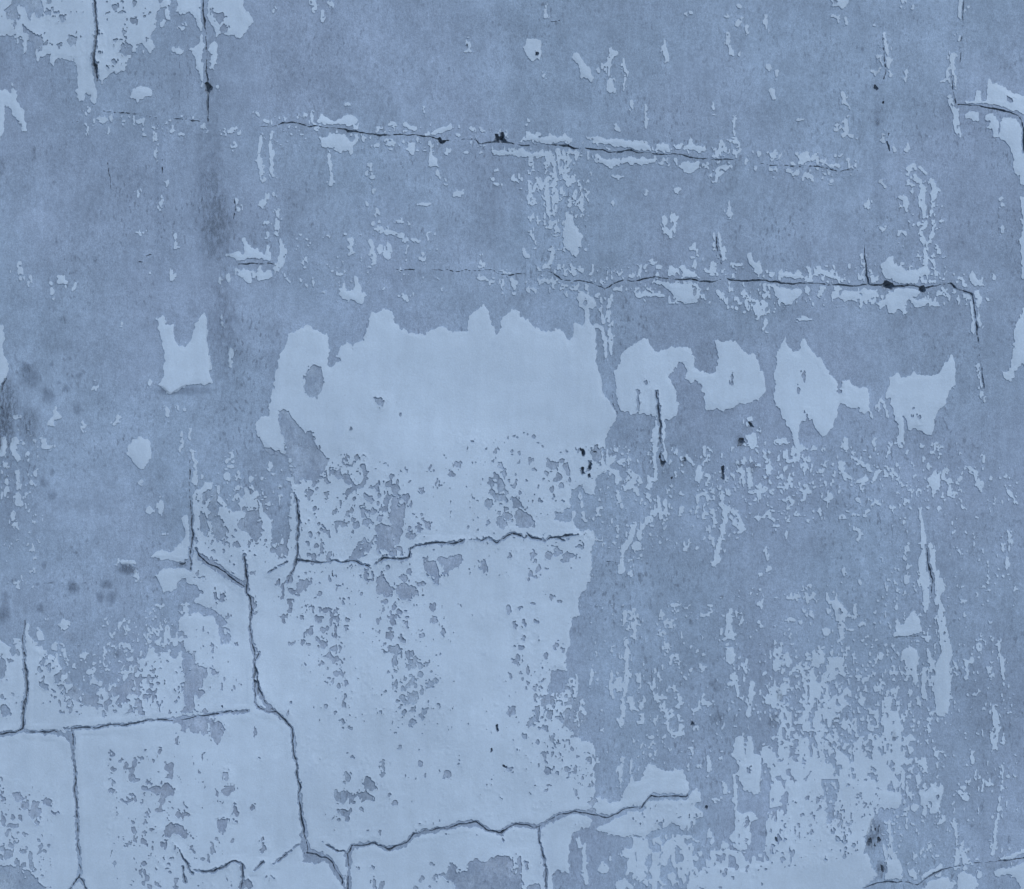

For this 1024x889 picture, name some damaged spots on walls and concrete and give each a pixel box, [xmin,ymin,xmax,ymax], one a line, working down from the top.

crack [91,0,99,81]
peeling [0,0,254,163]
crack [103,0,211,123]
crack [260,121,733,161]
peeling [940,32,1024,279]
crack [951,2,1024,153]
peeling [148,313,213,422]
crack [396,268,525,276]
crack [655,391,663,443]
crack [550,230,985,388]
peeling [1002,308,1024,382]
crack [0,461,688,889]